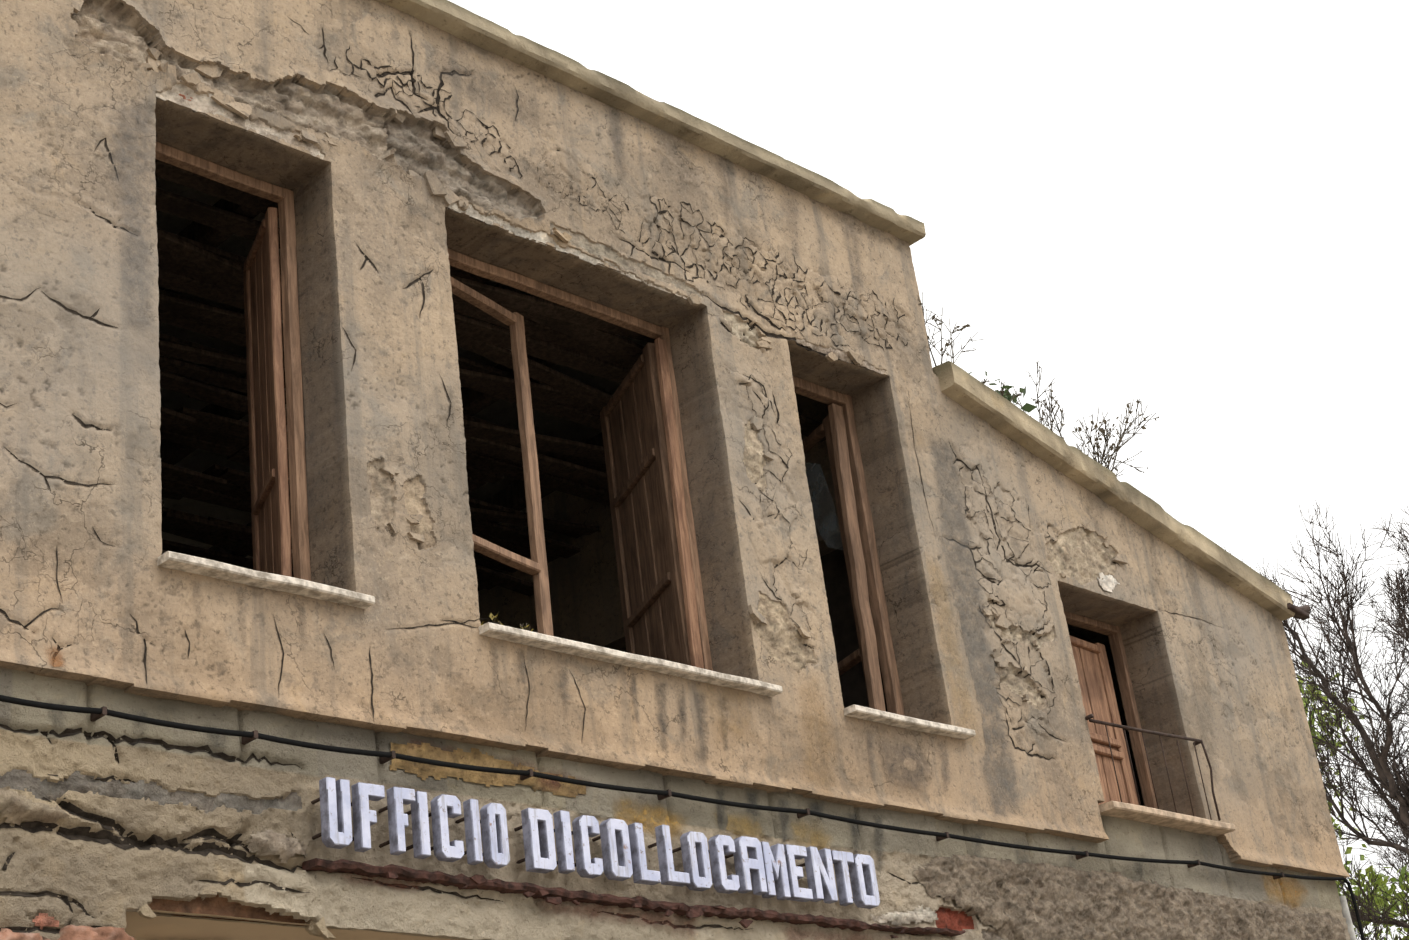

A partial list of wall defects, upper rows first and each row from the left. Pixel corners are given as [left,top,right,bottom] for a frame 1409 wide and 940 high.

spalling [71,0,701,306]
crack [0,287,118,328]
crack [291,19,908,649]
crack [3,446,112,490]
crack [72,414,111,431]
spalling [367,459,435,550]
crack [908,393,1084,760]
crack [130,614,190,683]
crack [369,619,478,725]
spalling [0,769,308,863]
spalling [32,913,59,930]
peeling [137,894,335,940]